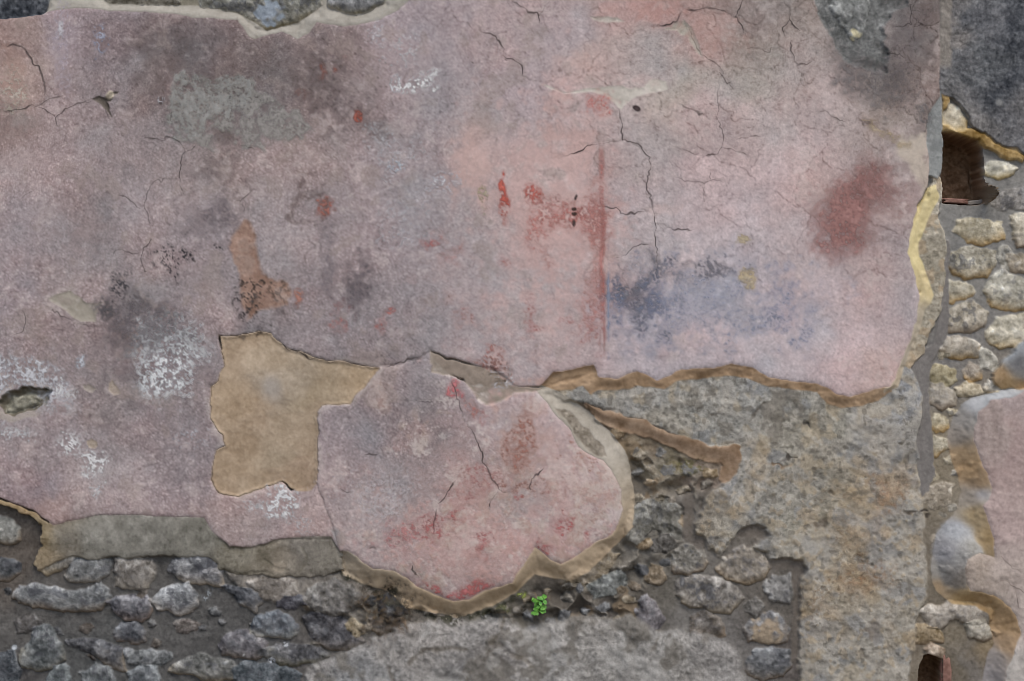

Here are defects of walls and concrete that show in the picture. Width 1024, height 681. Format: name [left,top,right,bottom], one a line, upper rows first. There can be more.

spalling [559,367,928,681]